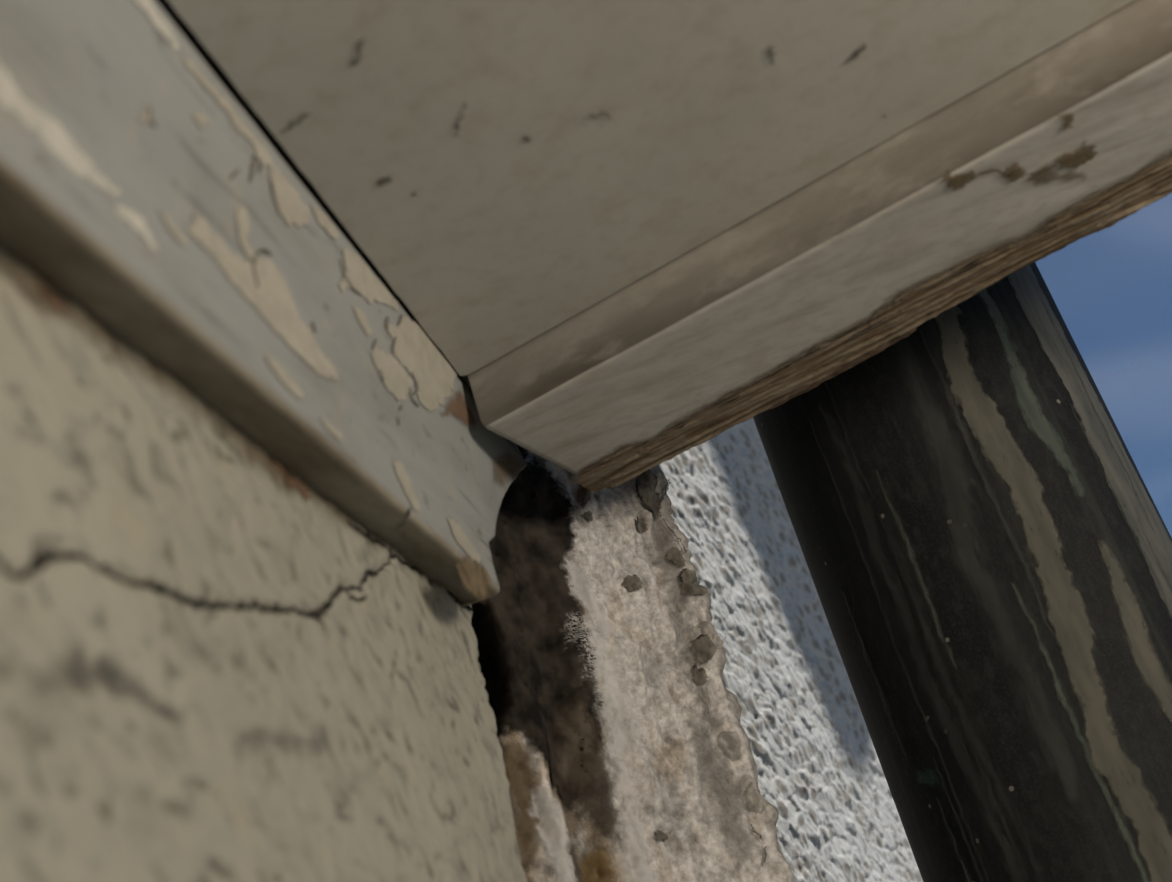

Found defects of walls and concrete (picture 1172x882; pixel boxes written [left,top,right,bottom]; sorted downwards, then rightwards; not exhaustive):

peeling [0,64,159,254]
peeling [135,0,457,425]
peeling [572,151,1172,532]
crack [0,508,473,639]
spalling [623,575,642,591]
spalling [665,547,708,595]
spalling [691,634,716,685]